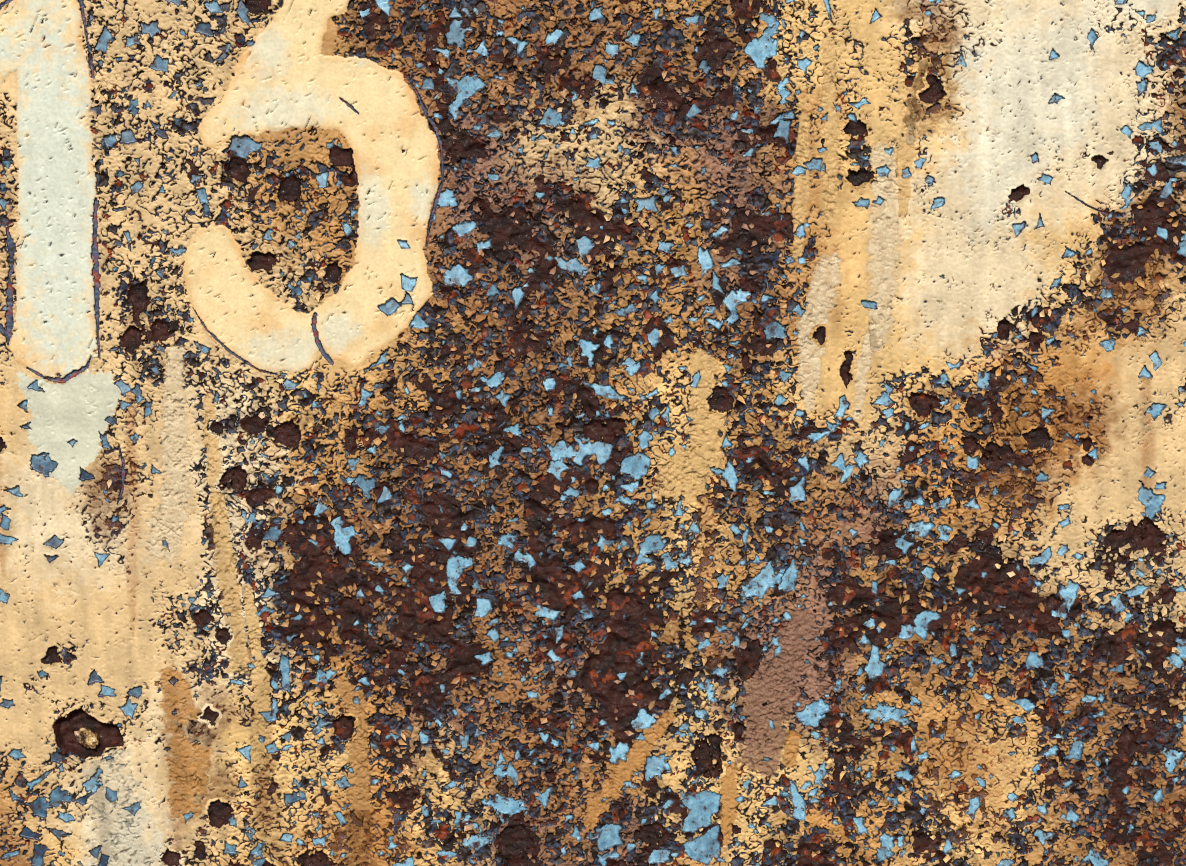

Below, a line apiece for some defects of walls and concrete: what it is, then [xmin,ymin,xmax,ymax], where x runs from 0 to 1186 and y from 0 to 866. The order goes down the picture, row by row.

peeling [86,9,181,212]
peeling [190,135,361,314]
corrosion [636,0,798,157]
corrosion [704,193,794,380]
spalling [814,83,894,209]
peeling [79,245,195,526]
corrosion [234,174,719,786]
corrosion [726,432,809,543]
peeling [170,571,249,658]
corrosion [797,490,1082,695]
corrosion [1069,522,1186,866]
peeling [0,752,141,866]